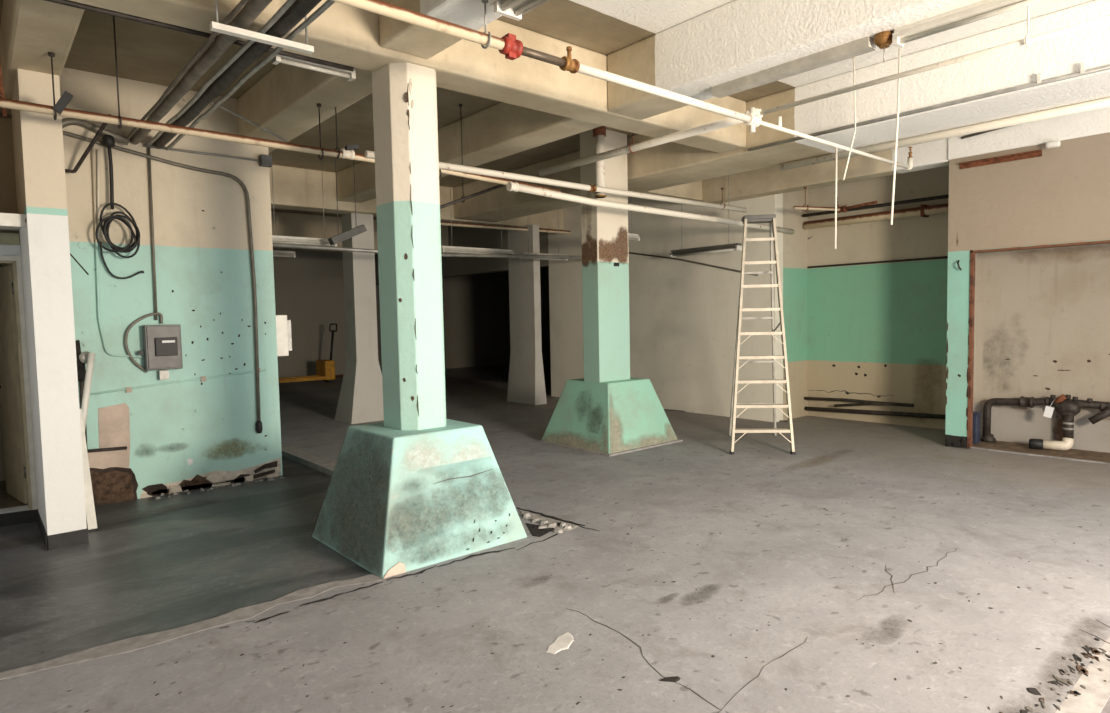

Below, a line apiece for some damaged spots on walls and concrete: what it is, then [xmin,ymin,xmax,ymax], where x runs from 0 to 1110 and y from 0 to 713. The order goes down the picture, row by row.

crack [859,548,957,600]
crack [569,609,808,713]